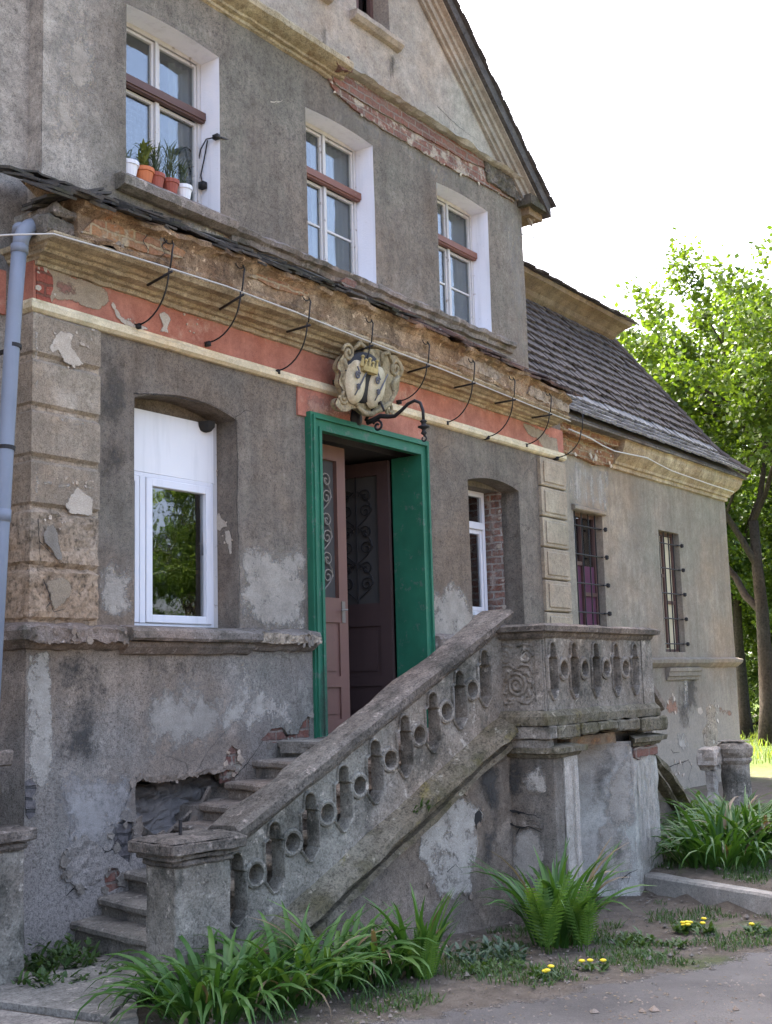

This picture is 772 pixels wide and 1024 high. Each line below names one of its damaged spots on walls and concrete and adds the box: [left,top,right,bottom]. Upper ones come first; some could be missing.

flaking render [327,75,522,203]
spalling [81,219,186,258]
flaking render [35,267,147,330]
flaking render [35,329,95,369]
flaking render [523,386,620,468]
flaking render [36,472,94,530]
flaking render [217,513,319,648]
water stain [61,703,94,758]
spalling [129,746,245,788]
spalling [101,815,143,894]
flaking render [419,791,485,901]